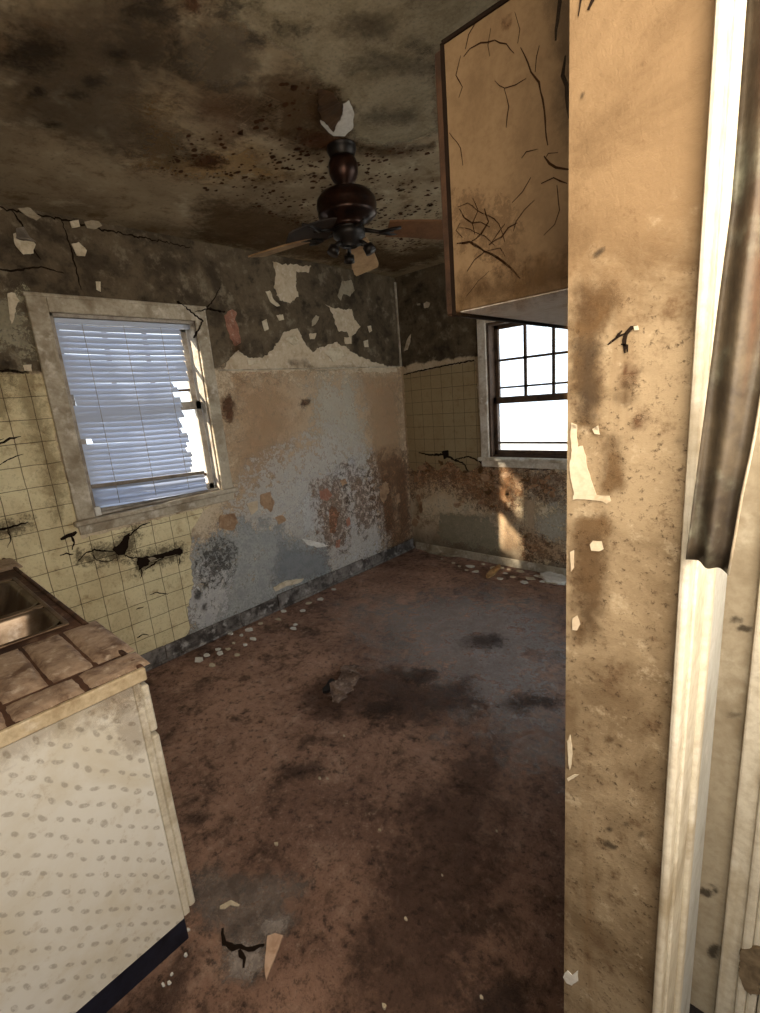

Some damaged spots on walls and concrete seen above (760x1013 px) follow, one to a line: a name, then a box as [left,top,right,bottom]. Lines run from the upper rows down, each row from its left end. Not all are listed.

peeling [226,0,499,156]
crack [0,206,190,290]
damp [127,74,357,265]
peeling [262,261,311,331]
peeling [224,280,397,373]
damp [355,147,444,271]
damp [572,287,612,425]
crack [419,450,482,472]
peeling [408,423,611,571]
damp [604,441,622,490]
peeling [76,492,331,634]
damp [574,516,608,637]